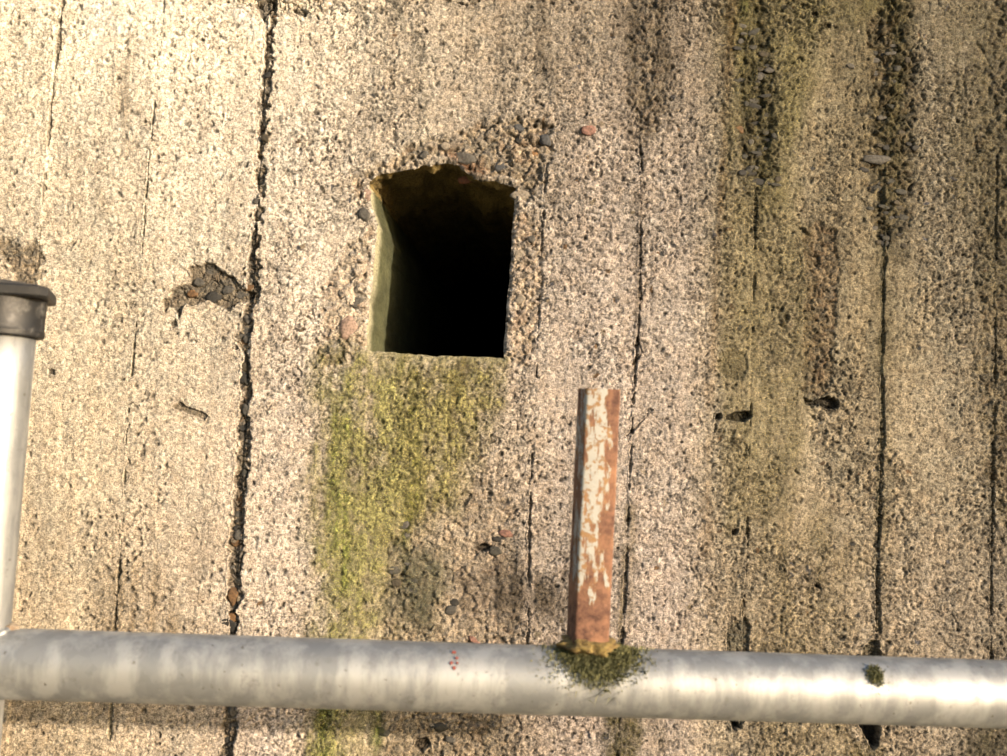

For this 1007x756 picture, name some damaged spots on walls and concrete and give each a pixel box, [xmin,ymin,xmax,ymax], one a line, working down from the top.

crack [443,0,496,8]
spalling [160,260,254,385]